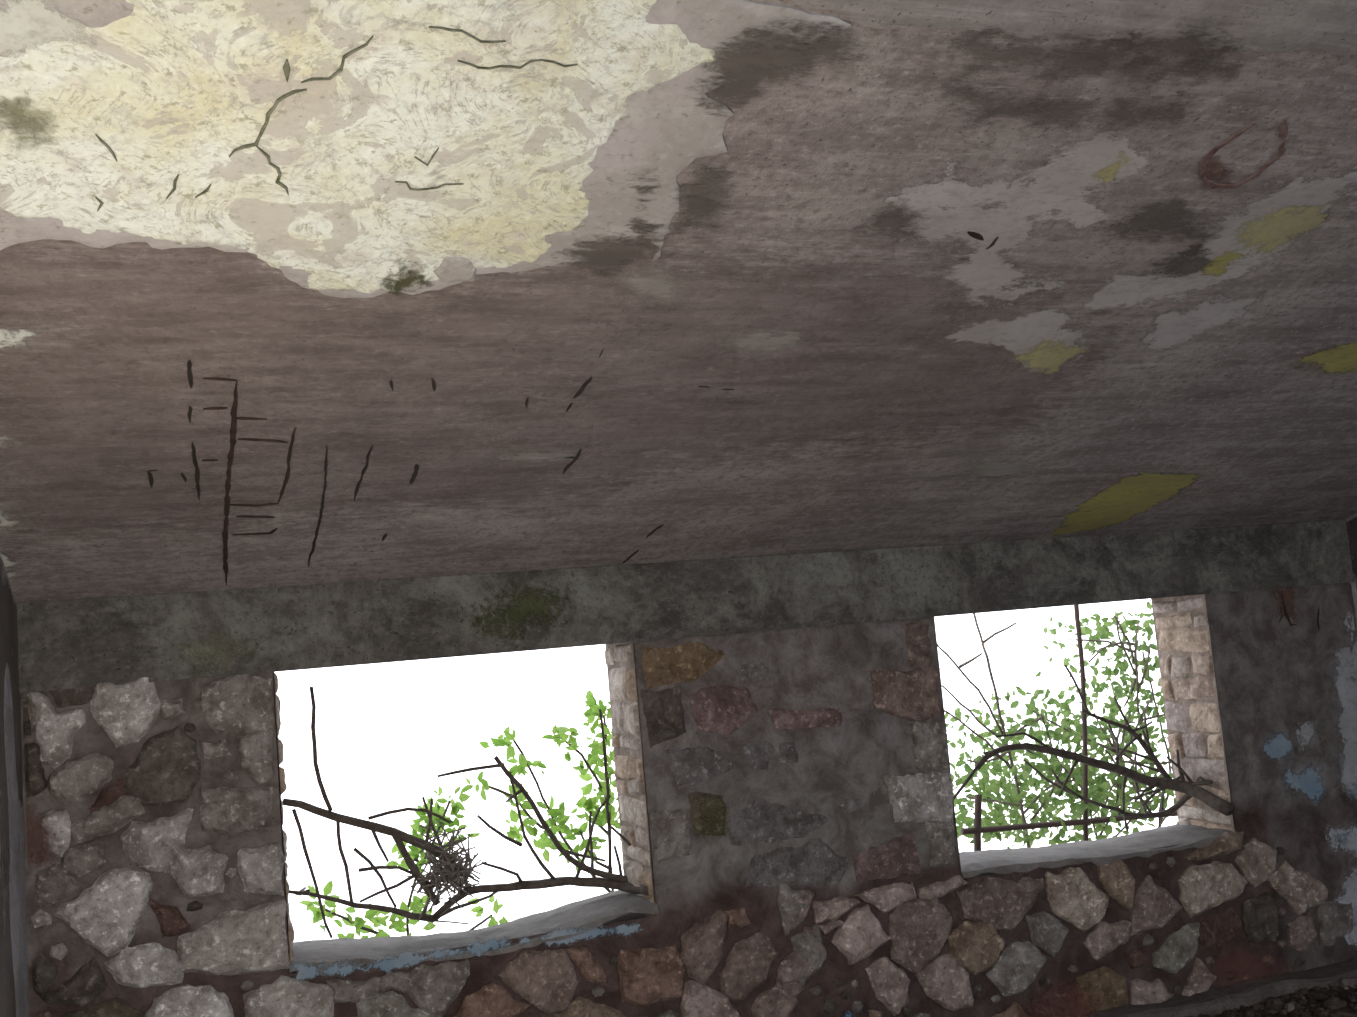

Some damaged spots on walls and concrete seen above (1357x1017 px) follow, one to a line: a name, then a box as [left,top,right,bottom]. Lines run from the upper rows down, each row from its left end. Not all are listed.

crack [95,134,117,162]
crack [166,35,373,199]
peeling [0,0,851,298]
crack [395,148,464,191]
crack [429,26,577,70]
water stain [942,23,1242,133]
water stain [1095,199,1215,277]
peeling [0,329,36,348]
crack [147,360,296,586]
peeling [1334,611,1357,799]
peeling [1263,722,1327,806]
peeling [1325,825,1357,946]